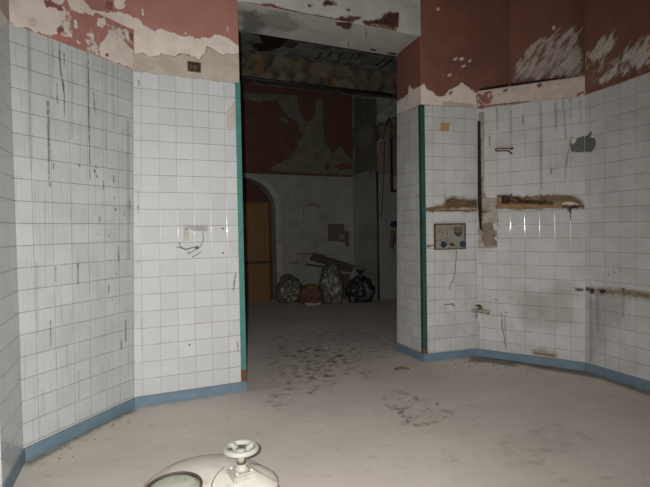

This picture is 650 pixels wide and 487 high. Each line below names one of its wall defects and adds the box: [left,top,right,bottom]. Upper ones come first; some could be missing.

peeling [9,0,239,84]
spalling [334,9,399,30]
peeling [241,92,353,175]
peeling [397,25,650,248]
rust [575,287,649,297]